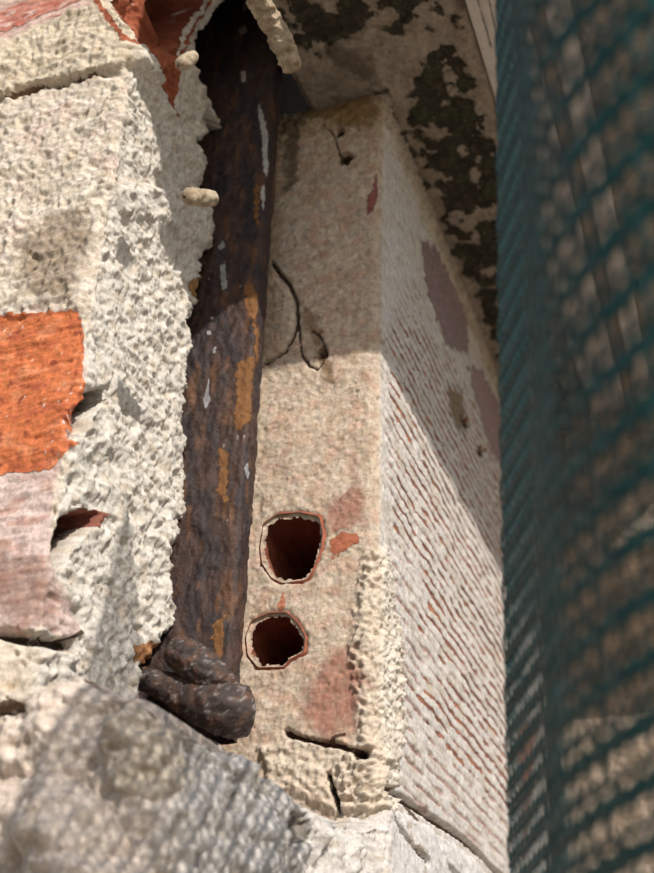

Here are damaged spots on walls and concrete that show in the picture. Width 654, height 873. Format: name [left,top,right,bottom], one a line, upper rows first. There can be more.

peeling [0,0,79,31]
spalling [94,0,212,117]
water stain [277,0,466,79]
water stain [258,105,269,209]
water stain [402,44,508,463]
peeling [0,309,86,475]
corrosion [233,283,260,431]
corrosion [215,447,230,503]
water stain [330,491,360,559]
corrosion [133,640,161,664]
crack [287,732,369,759]
crack [329,775,341,813]